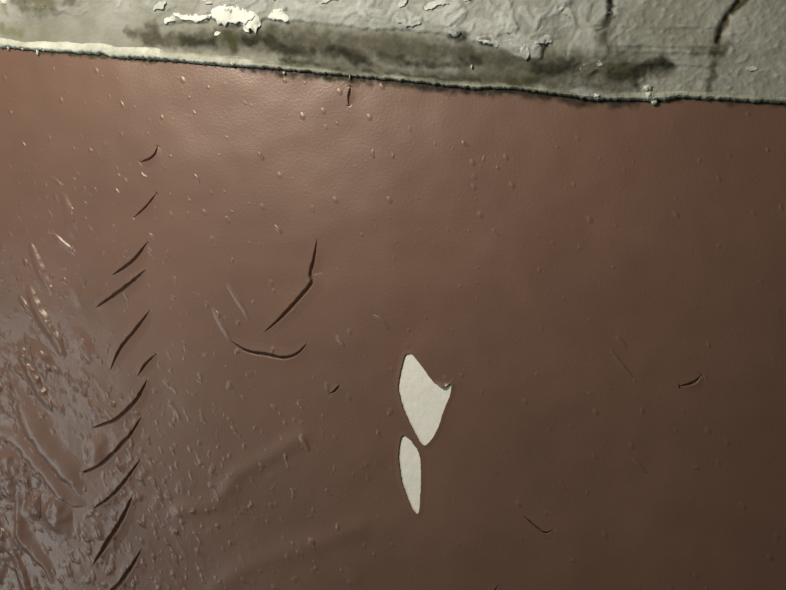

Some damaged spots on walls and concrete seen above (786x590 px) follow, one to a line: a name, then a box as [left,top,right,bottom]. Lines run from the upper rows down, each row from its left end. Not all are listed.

peeling [153,0,289,36]
peeling [424,0,449,10]
crack [598,0,614,50]
damp [39,51,155,62]
flaking render [0,35,786,105]
damp [129,25,673,107]
crack [342,87,356,105]
crack [132,191,159,220]
crack [228,239,324,368]
crack [79,240,158,590]
peeling [393,348,457,519]